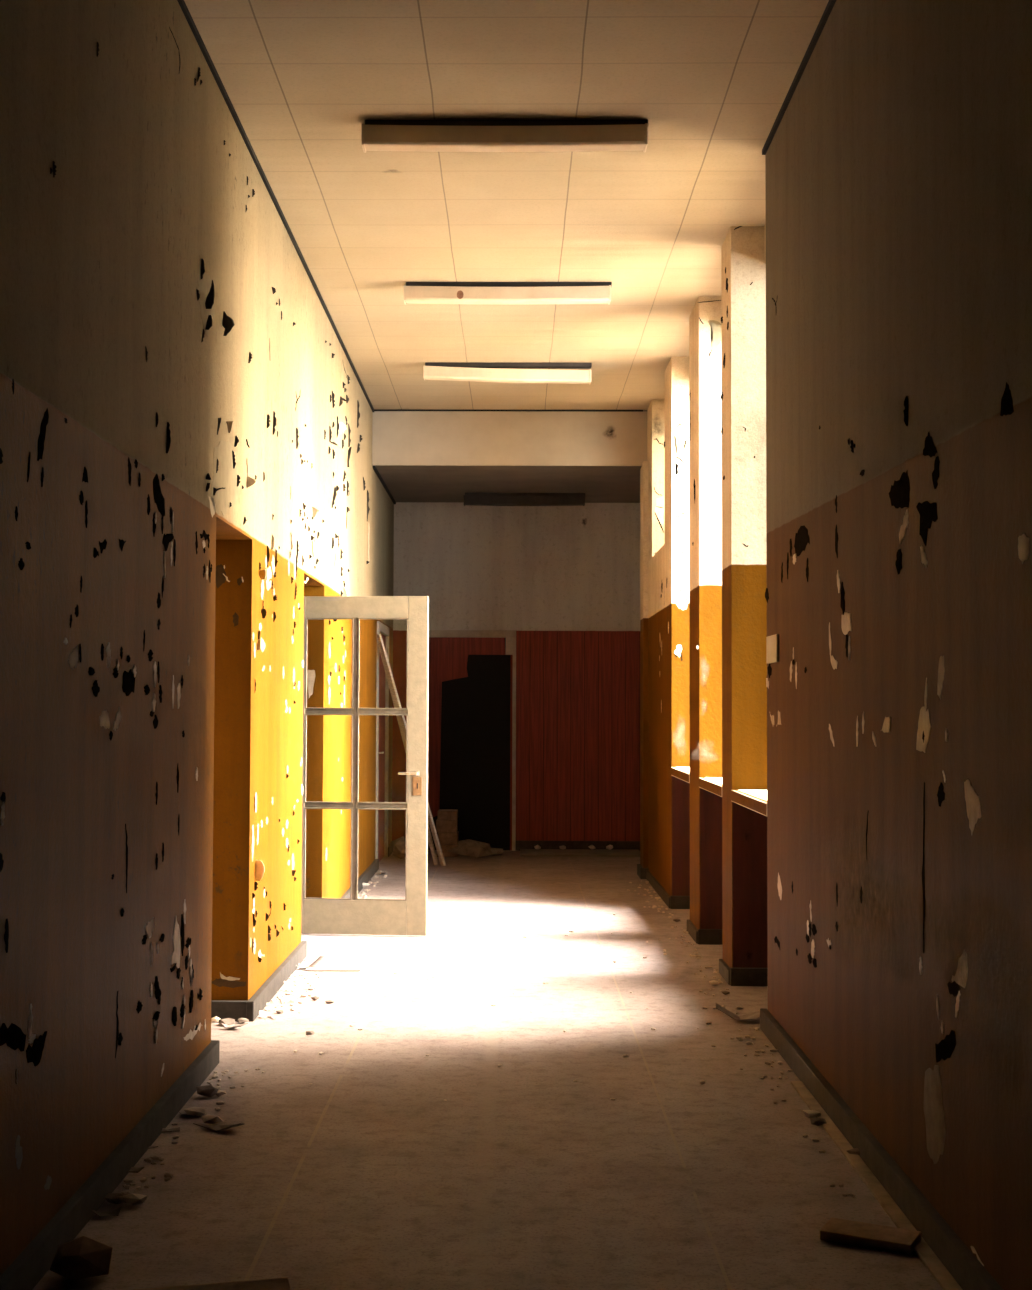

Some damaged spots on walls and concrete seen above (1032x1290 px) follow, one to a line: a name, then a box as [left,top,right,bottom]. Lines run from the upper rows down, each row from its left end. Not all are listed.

peeling [197,259,234,342]
peeling [664,417,691,463]
peeling [195,418,265,588]
peeling [252,340,370,714]
peeling [765,526,810,603]
peeling [829,495,852,670]
peeling [889,432,940,574]
flaking render [916,655,948,753]
peeling [251,758,303,881]
flaking render [964,780,982,834]
peeling [250,887,293,962]
peeling [796,882,839,968]